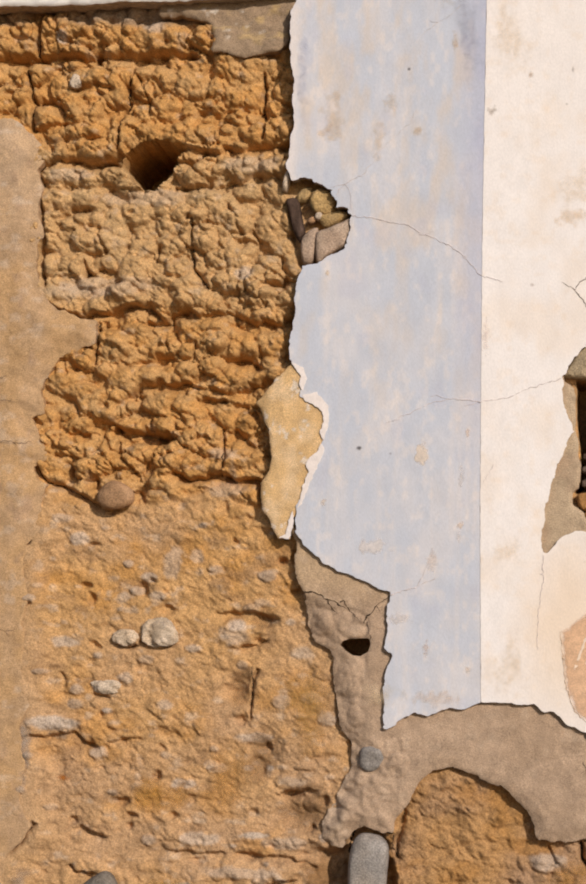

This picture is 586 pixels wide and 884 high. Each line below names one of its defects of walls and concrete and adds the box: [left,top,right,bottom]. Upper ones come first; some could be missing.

crack [334,164,503,282]
spalling [0,7,352,855]
spalling [574,380,586,495]
peeling [564,618,586,717]